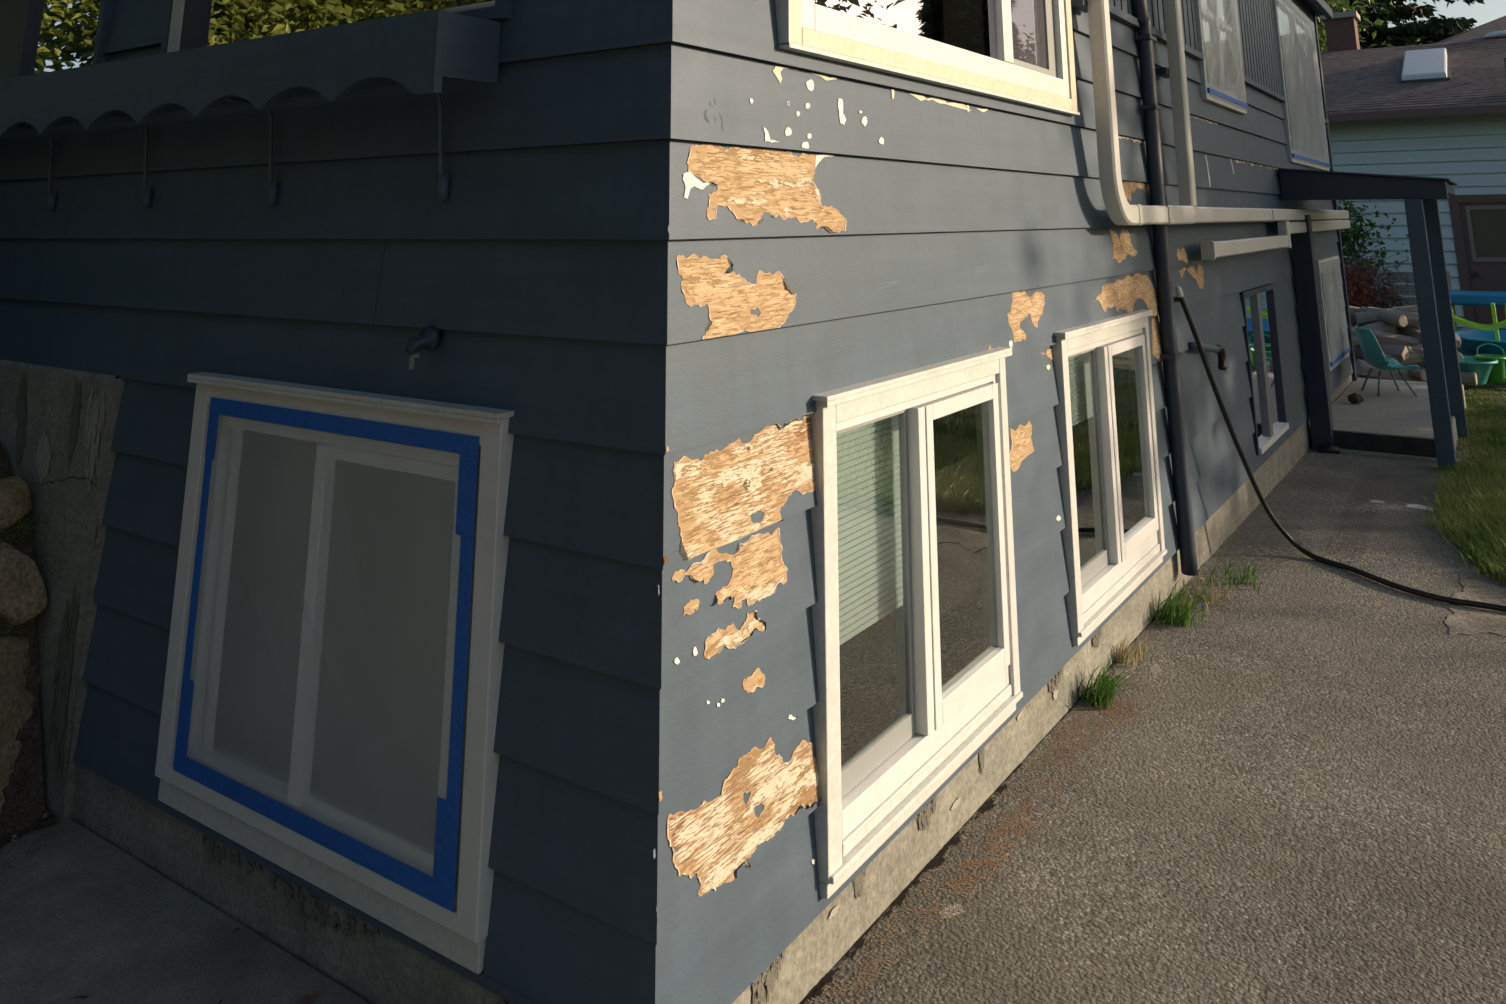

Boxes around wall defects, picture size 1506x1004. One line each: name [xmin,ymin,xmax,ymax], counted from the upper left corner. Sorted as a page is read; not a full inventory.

peeling [682,127,847,233]
peeling [676,253,796,339]
peeling [1007,291,1045,348]
peeling [1095,229,1162,361]
peeling [1176,248,1204,289]
peeling [1009,421,1034,472]
peeling [657,414,816,665]
peeling [653,737,821,896]